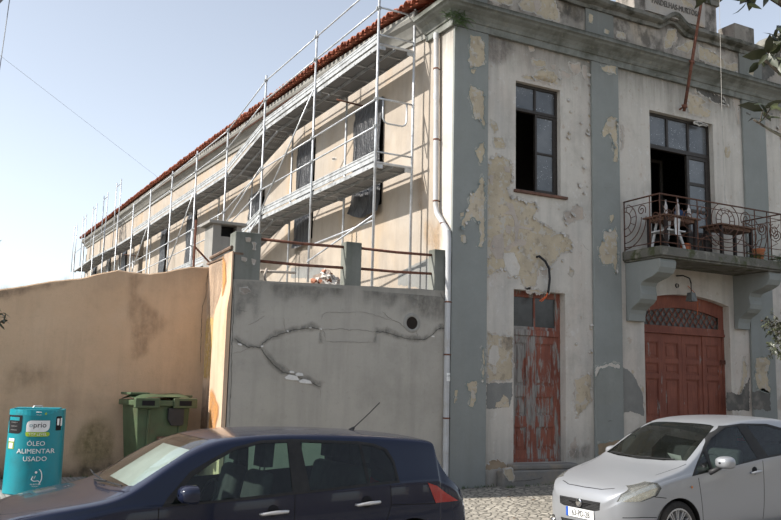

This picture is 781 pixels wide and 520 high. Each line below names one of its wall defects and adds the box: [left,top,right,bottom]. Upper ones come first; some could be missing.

peeling [489,0,560,23]
peeling [467,34,487,74]
peeling [568,61,625,163]
peeling [460,84,585,296]
crack [230,289,443,398]
peeling [453,331,515,409]
peeling [572,361,620,419]
peeling [737,356,771,395]